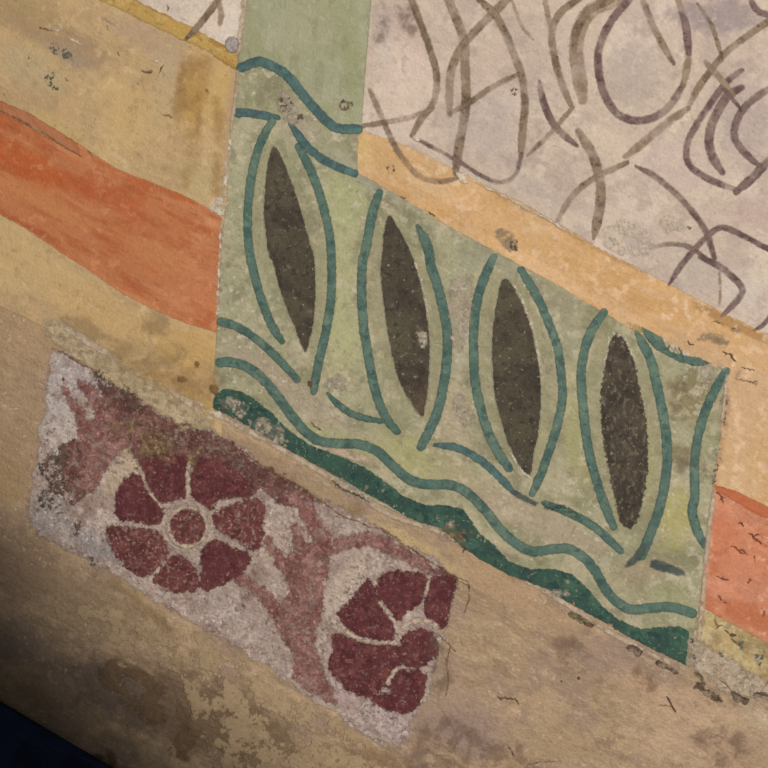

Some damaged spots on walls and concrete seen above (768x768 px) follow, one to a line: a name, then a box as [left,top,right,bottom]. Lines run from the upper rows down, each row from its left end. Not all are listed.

spalling [568,612,594,627]
spalling [626,645,643,657]